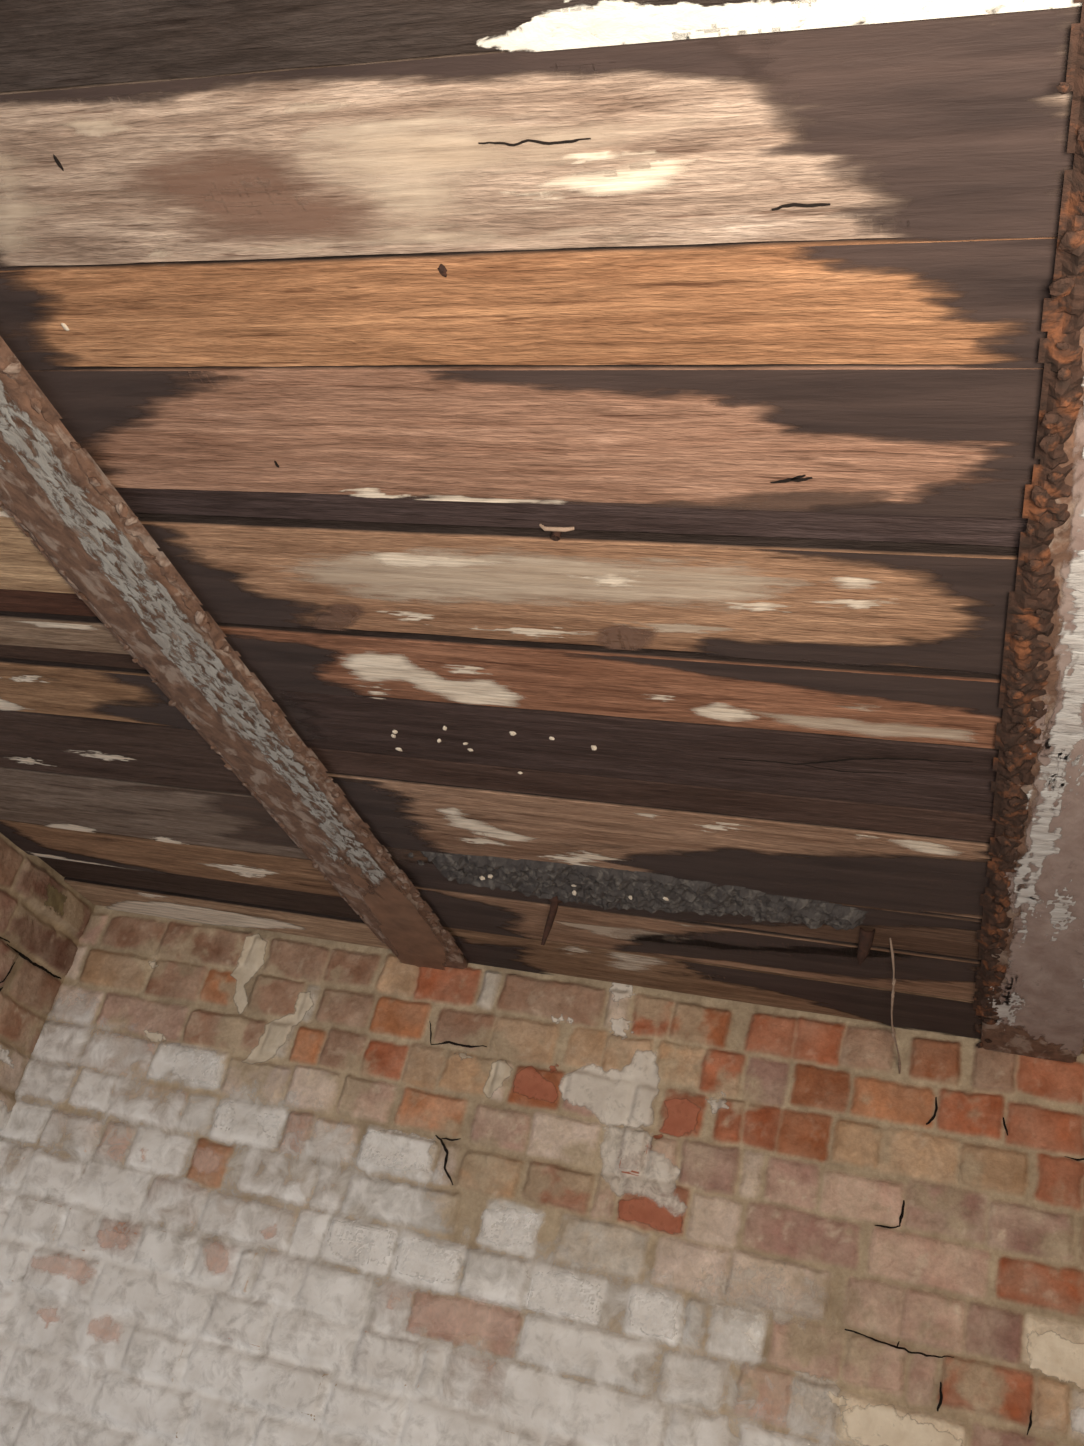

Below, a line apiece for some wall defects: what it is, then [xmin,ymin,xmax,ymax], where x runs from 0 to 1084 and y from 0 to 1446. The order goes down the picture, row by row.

peeling [477,0,1082,52]
corrosion [973,0,1084,1048]
peeling [0,380,391,886]
peeling [447,665,483,674]
peeling [990,415,1084,1056]
peeling [463,837,509,846]
peeling [539,851,616,867]
peeling [609,983,635,1040]
crack [435,1135,461,1185]
peeling [0,1001,835,1446]
crack [845,1329,954,1411]
crack [1025,1410,1033,1435]